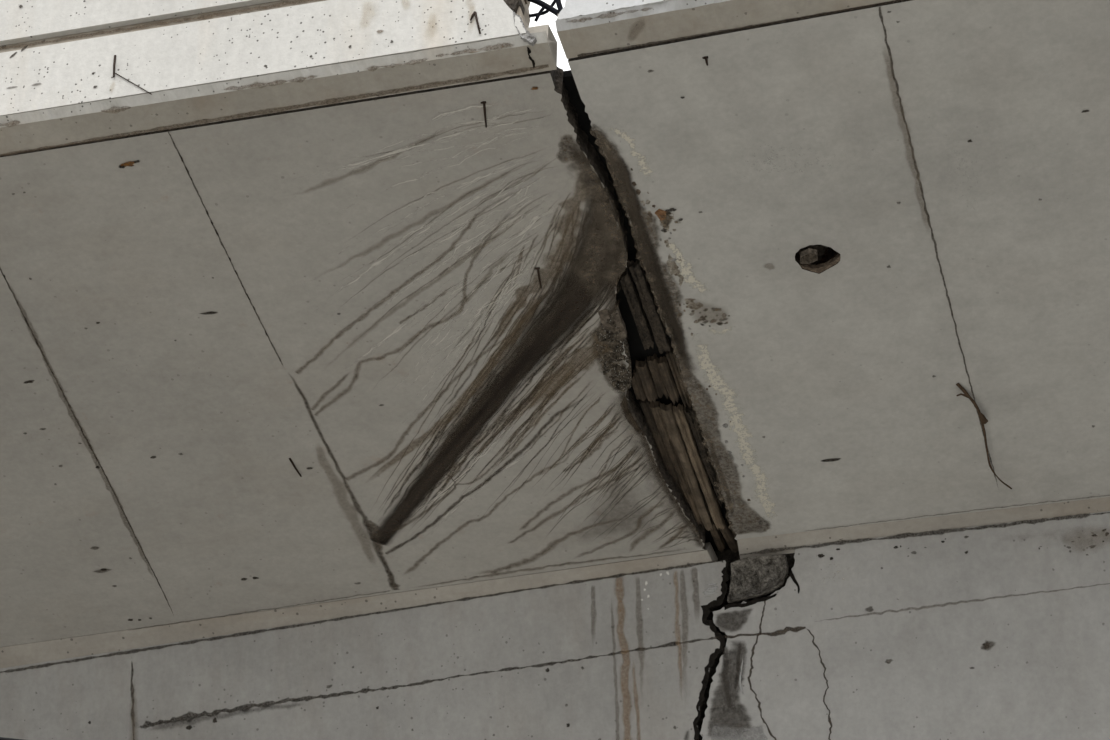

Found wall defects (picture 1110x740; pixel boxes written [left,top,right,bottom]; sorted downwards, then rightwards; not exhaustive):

spalling [503,0,537,46]
peeling [621,168,703,336]
leakage [295,127,778,590]
spalling [593,304,643,433]
crack [693,559,832,740]